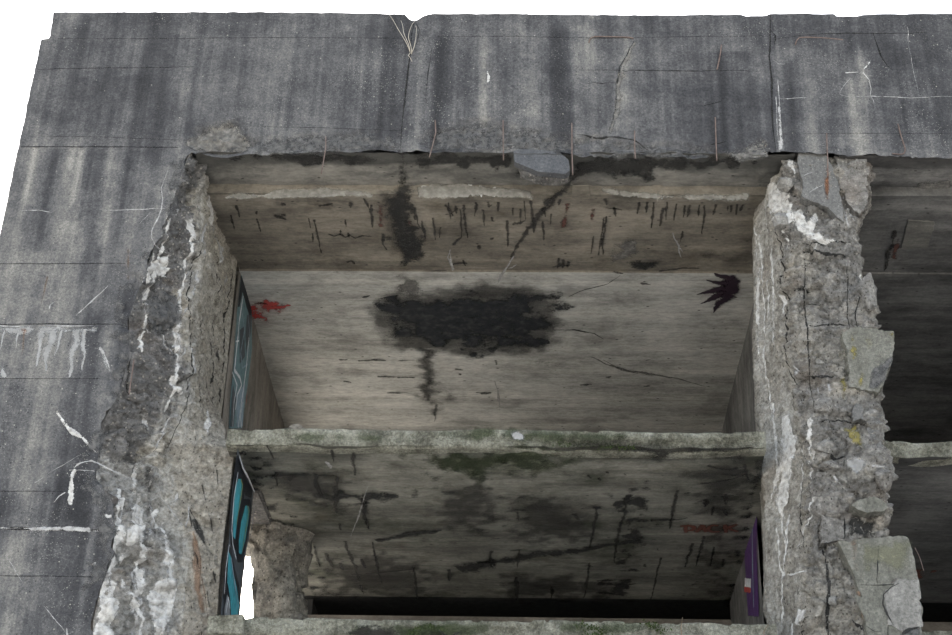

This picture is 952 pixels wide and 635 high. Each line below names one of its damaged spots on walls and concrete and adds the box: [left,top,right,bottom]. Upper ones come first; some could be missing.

spalling [187,122,397,174]
leakage [226,151,561,266]
crack [498,166,594,283]
crack [577,41,745,152]
spalling [795,133,870,224]
crack [768,14,952,151]
leakage [137,196,229,452]
leakage [362,282,574,419]
leakage [754,180,836,635]
crack [772,221,865,435]
spalling [840,326,895,398]
spalling [819,497,923,635]